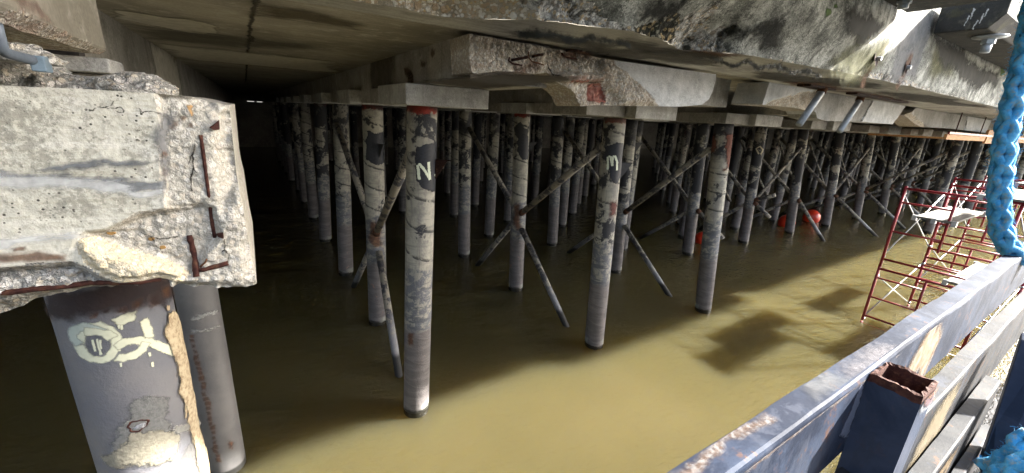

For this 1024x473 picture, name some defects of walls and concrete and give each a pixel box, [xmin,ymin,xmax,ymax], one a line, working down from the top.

crack [245,0,260,82]
spalling [0,94,257,313]
crack [189,144,197,191]
corrosion [44,278,175,320]
peeling [111,305,210,473]